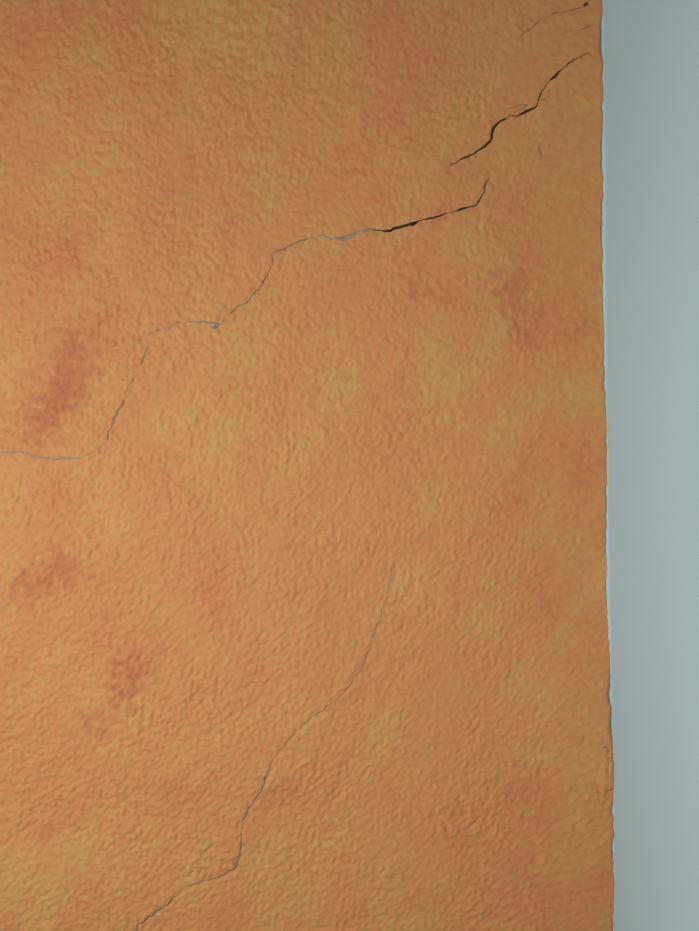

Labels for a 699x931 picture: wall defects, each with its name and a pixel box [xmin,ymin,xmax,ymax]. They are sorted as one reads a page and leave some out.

crack [440,53,589,171]
crack [521,0,593,36]
crack [0,178,489,460]
crack [135,558,396,931]